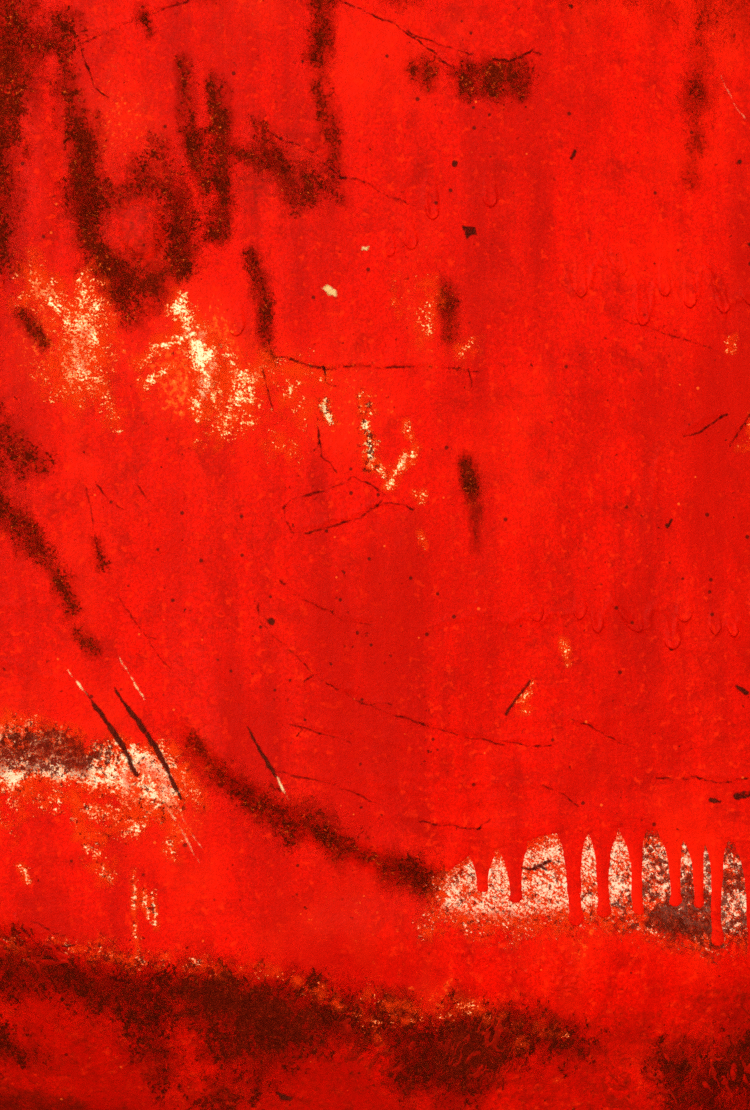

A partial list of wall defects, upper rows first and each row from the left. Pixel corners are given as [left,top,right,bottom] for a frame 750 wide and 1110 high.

rust [406,53,539,110]
rust [0,0,328,332]
rust [12,307,50,350]
peeling [10,250,339,464]
rust [241,245,279,366]
rust [0,403,101,655]
peeling [356,391,419,491]
rust [458,456,482,498]
peeling [0,709,208,885]
rust [185,728,462,903]
peeling [0,868,225,978]
peeling [412,830,748,964]